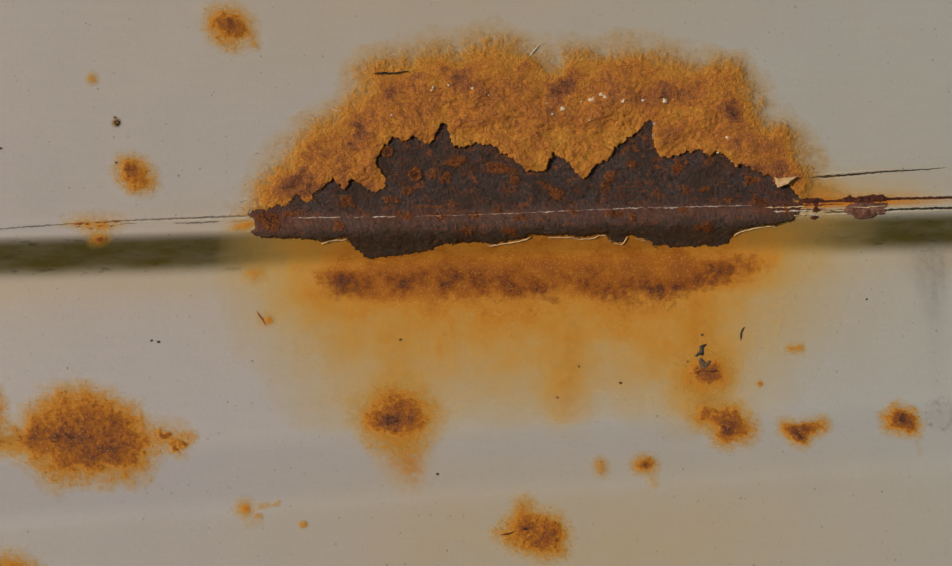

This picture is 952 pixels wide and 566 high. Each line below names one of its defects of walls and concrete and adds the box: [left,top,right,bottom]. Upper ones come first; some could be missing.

corrosion [206,5,257,51]
corrosion [115,156,156,194]
peeling [248,120,808,259]
corrosion [844,202,888,220]
corrosion [247,202,829,474]
corrosion [0,386,197,489]
corrosion [880,403,920,436]
corrosion [491,499,568,560]
corrosion [0,555,36,566]